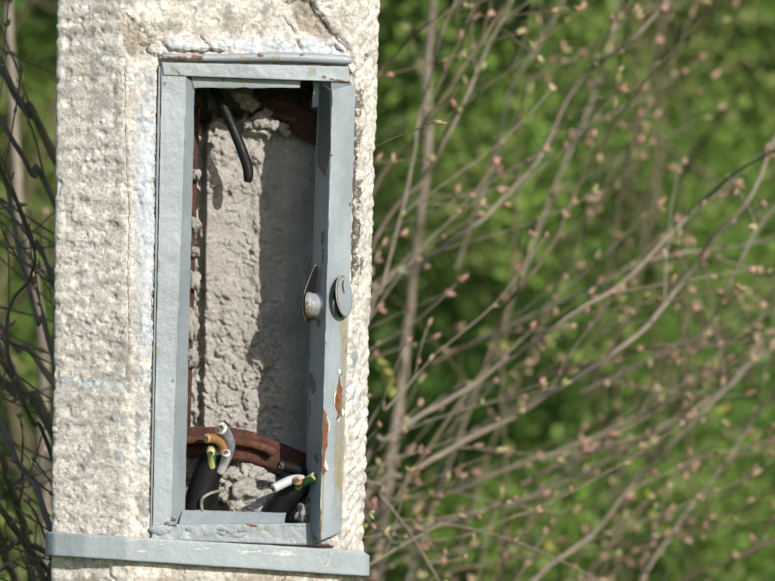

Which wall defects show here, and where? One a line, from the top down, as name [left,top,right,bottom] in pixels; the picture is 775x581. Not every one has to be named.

crack [284,0,348,53]
corrosion [229,428,307,475]